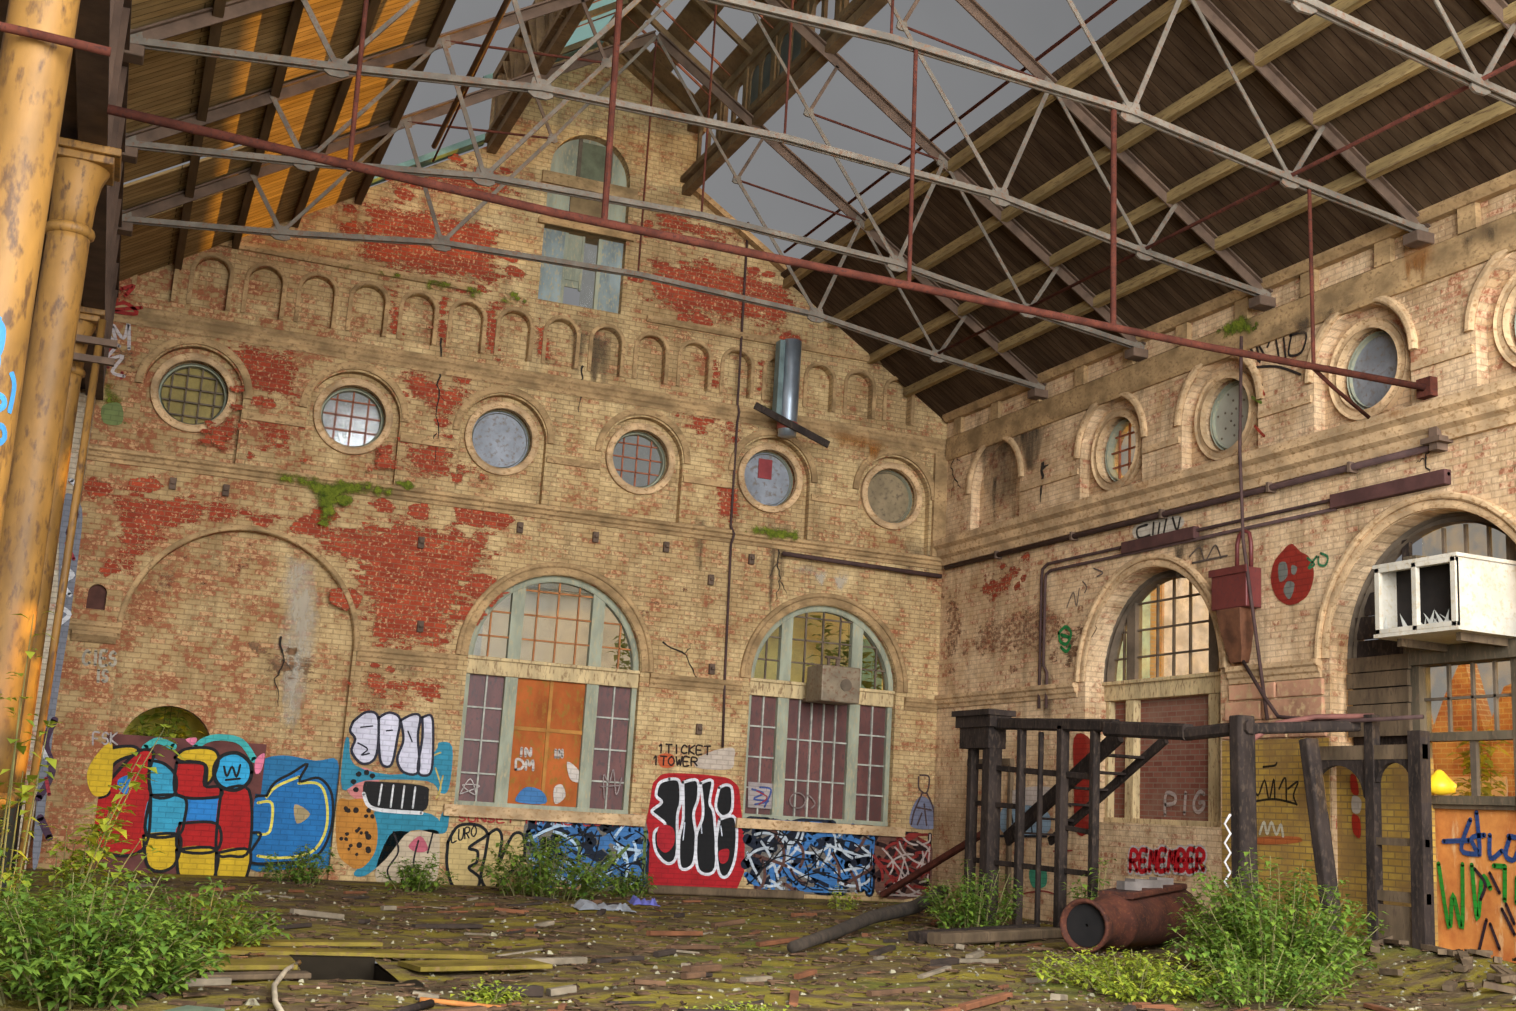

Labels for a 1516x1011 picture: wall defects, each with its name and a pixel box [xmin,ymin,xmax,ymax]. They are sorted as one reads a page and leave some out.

peeling [338,153,528,363]
peeling [627,212,802,341]
peeling [83,476,516,711]